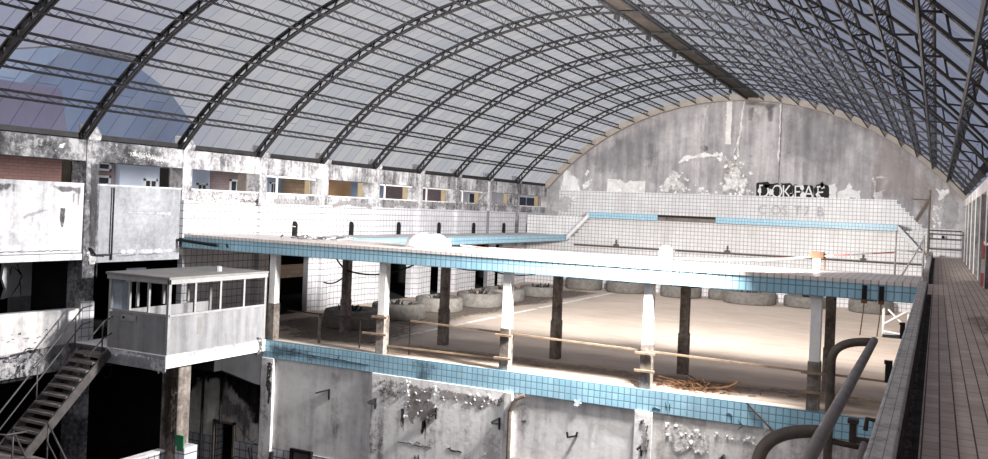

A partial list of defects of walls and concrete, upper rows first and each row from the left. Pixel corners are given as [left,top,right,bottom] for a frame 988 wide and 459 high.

peeling [659,101,753,196]
peeling [607,179,645,192]
peeling [829,183,860,199]
leakage [514,290,592,306]
leakage [279,316,376,344]
leakage [389,312,438,341]
leakage [450,307,502,319]
leakage [272,345,300,355]
leakage [161,375,177,459]
leakage [218,372,261,437]
peeling [375,379,503,426]
peeling [664,423,758,455]